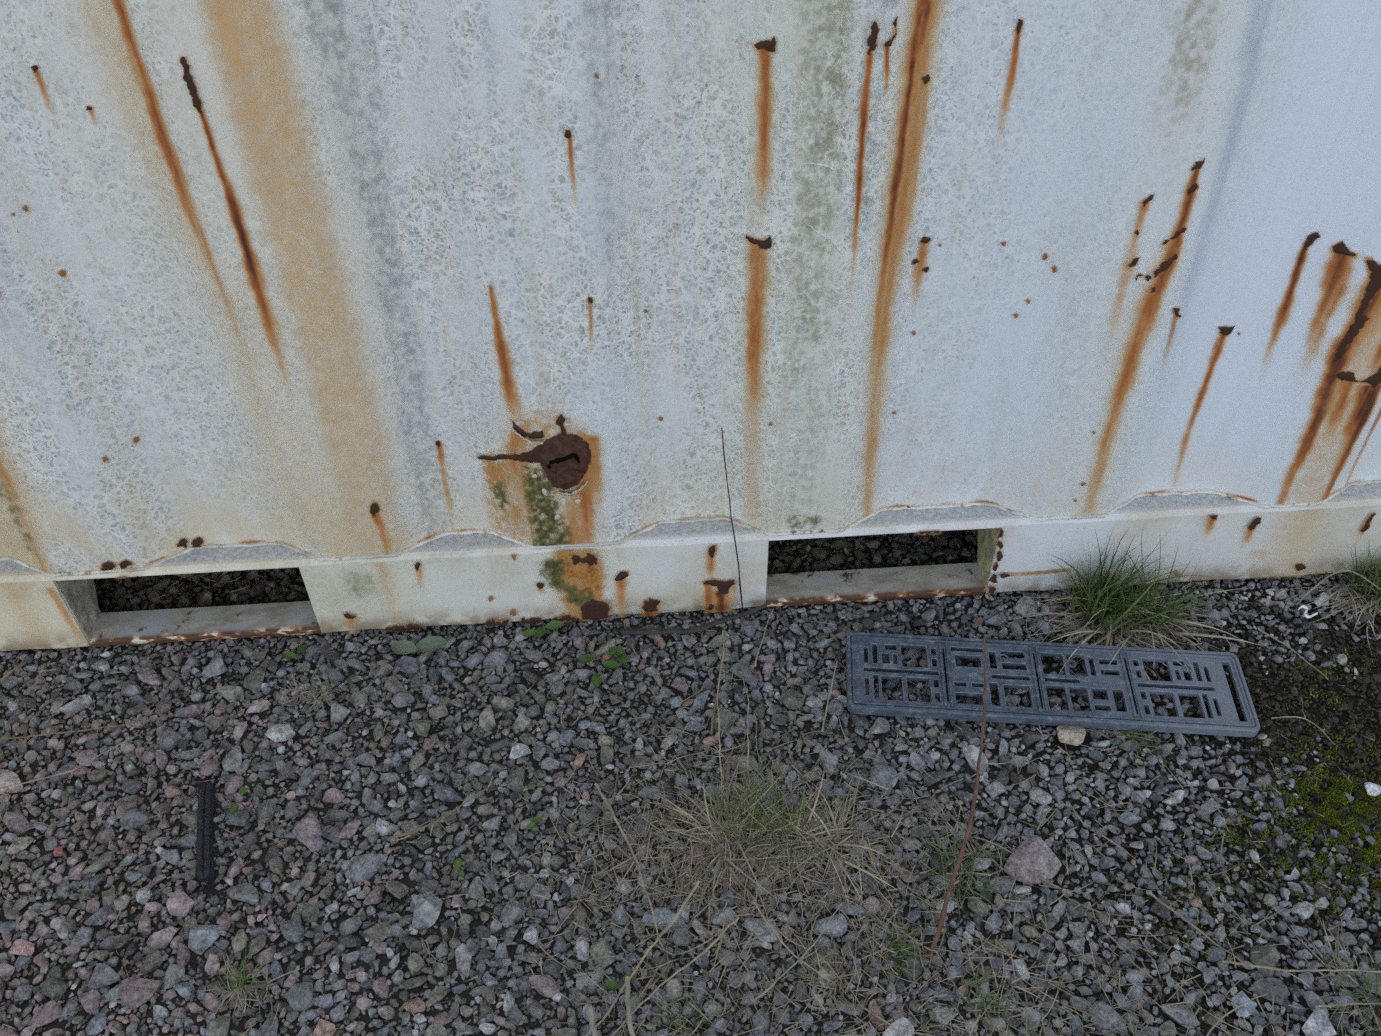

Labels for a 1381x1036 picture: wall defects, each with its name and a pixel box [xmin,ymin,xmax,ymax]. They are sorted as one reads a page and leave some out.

corrosion [111,0,227,303]
corrosion [180,57,282,365]
corrosion [488,285,519,413]
corrosion [745,236,772,414]
corrosion [754,37,776,188]
corrosion [853,0,942,519]
corrosion [1003,19,1023,112]
corrosion [1073,158,1205,502]
corrosion [1178,326,1240,470]
corrosion [1268,232,1381,536]
corrosion [486,549,629,626]
corrosion [703,545,737,613]